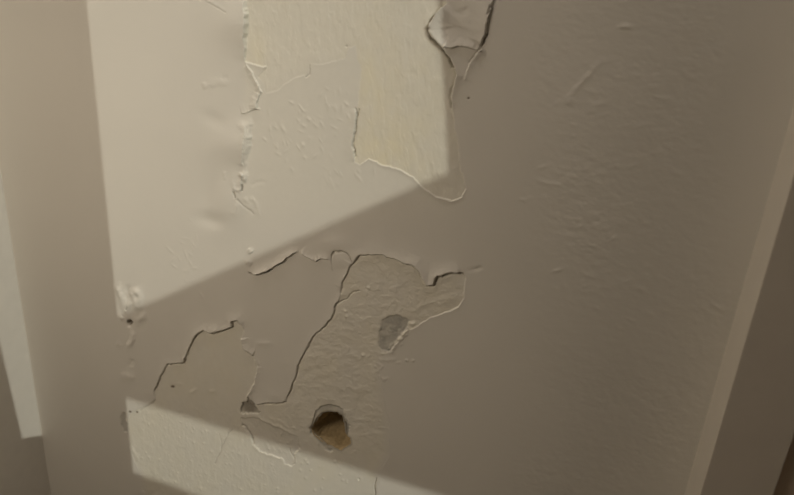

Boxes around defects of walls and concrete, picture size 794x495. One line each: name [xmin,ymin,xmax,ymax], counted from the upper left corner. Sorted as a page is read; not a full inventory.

peeling [232,0,470,204]
peeling [120,235,476,495]